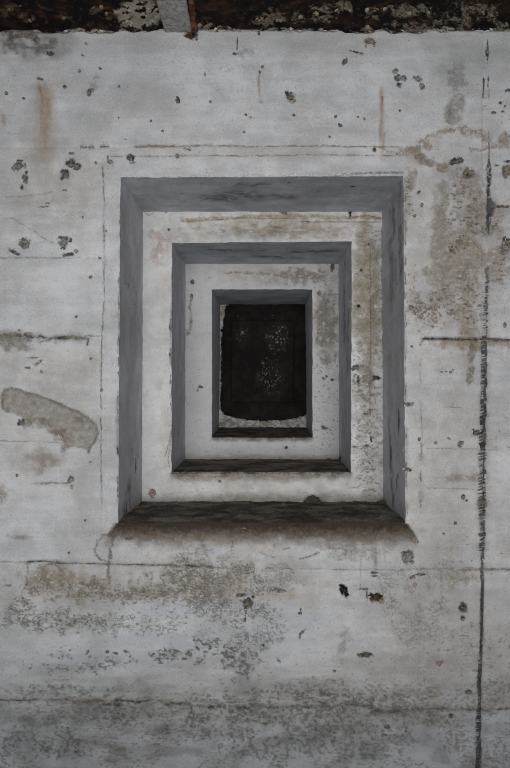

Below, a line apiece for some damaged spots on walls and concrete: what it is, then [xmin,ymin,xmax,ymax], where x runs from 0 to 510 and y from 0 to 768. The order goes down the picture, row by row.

crack [486,143,509,233]
water stain [398,98,510,384]
water stain [1,388,99,453]
crack [405,267,510,768]
water stain [33,533,114,593]
crack [375,706,444,714]